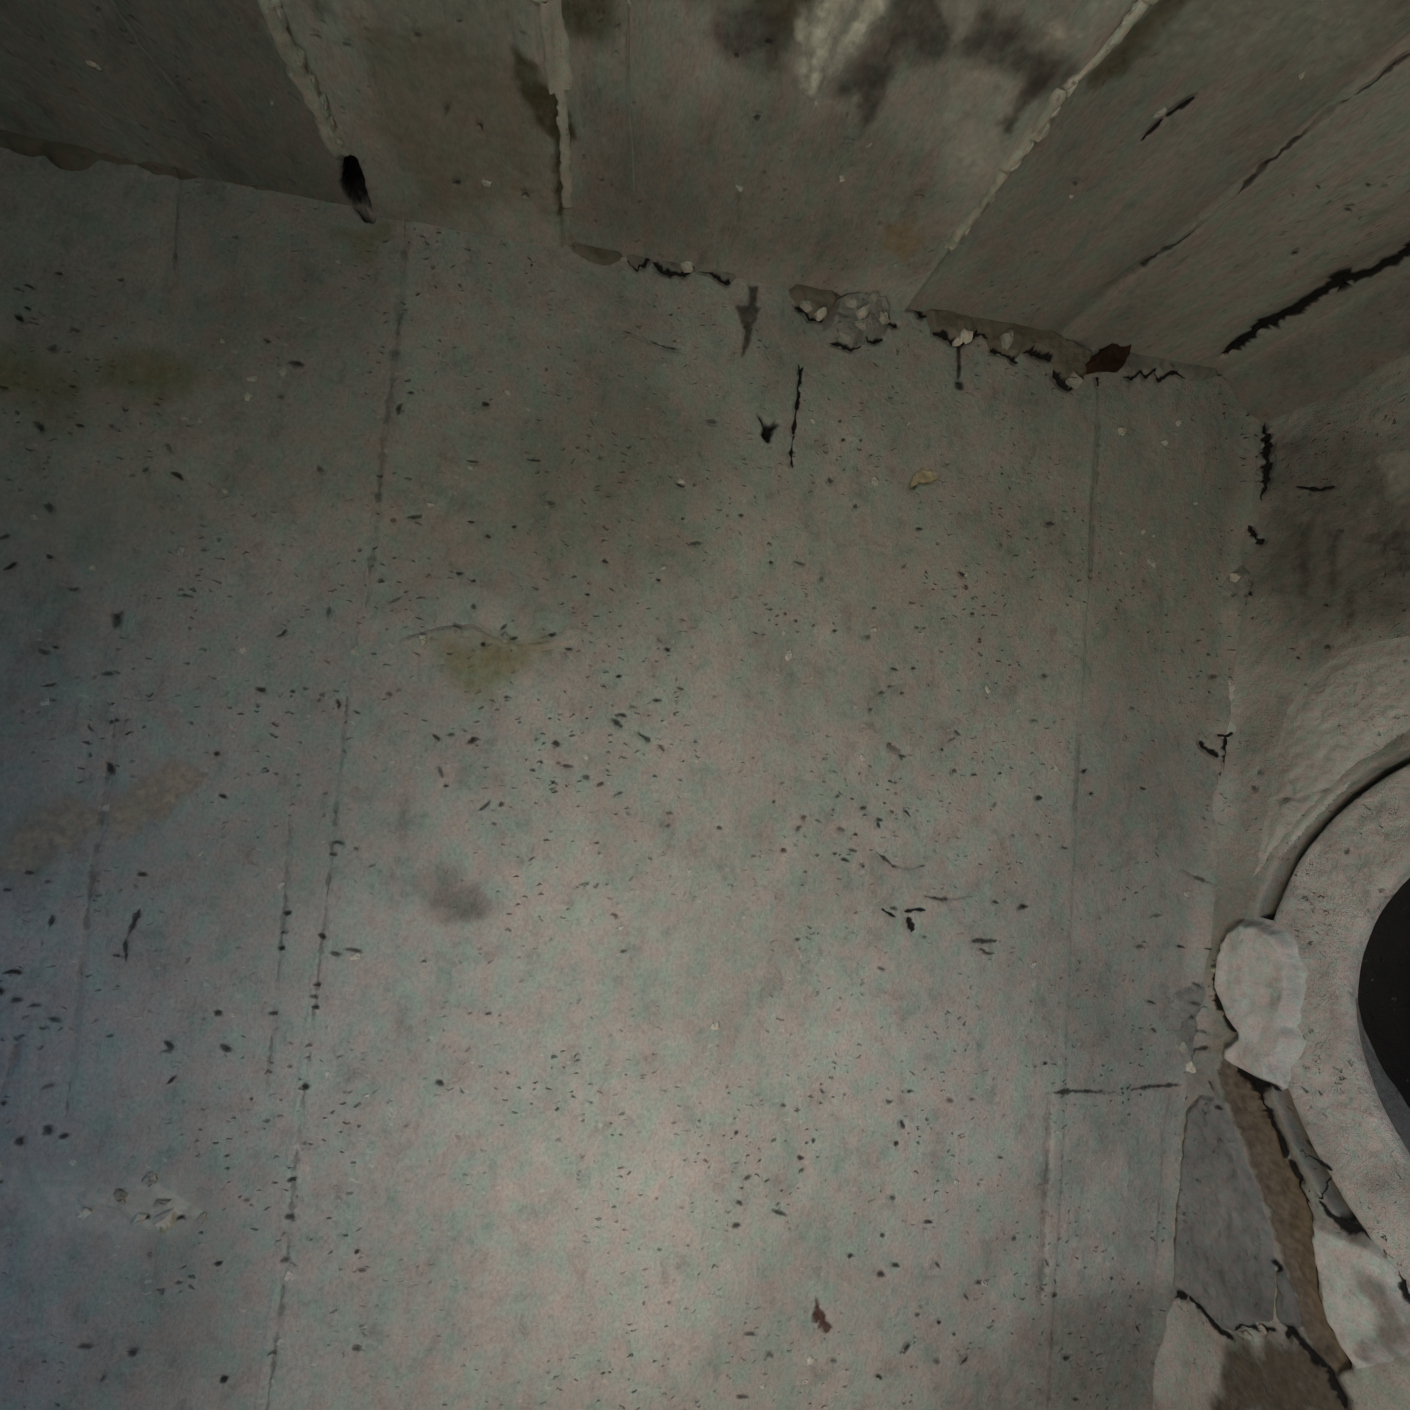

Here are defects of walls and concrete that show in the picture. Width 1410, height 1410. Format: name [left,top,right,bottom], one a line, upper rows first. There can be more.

water stain [561,0,605,33]
water stain [726,0,949,121]
spalling [789,284,890,344]
peeling [952,328,973,347]
crack [795,292,1185,392]
peeling [1000,329,1014,350]
peeling [1065,370,1083,389]
crack [1247,423,1335,545]
crack [1185,974,1371,1239]
spalling [1218,1057,1351,1375]
crack [1399,1272,1410,1304]
crack [1175,1291,1352,1409]